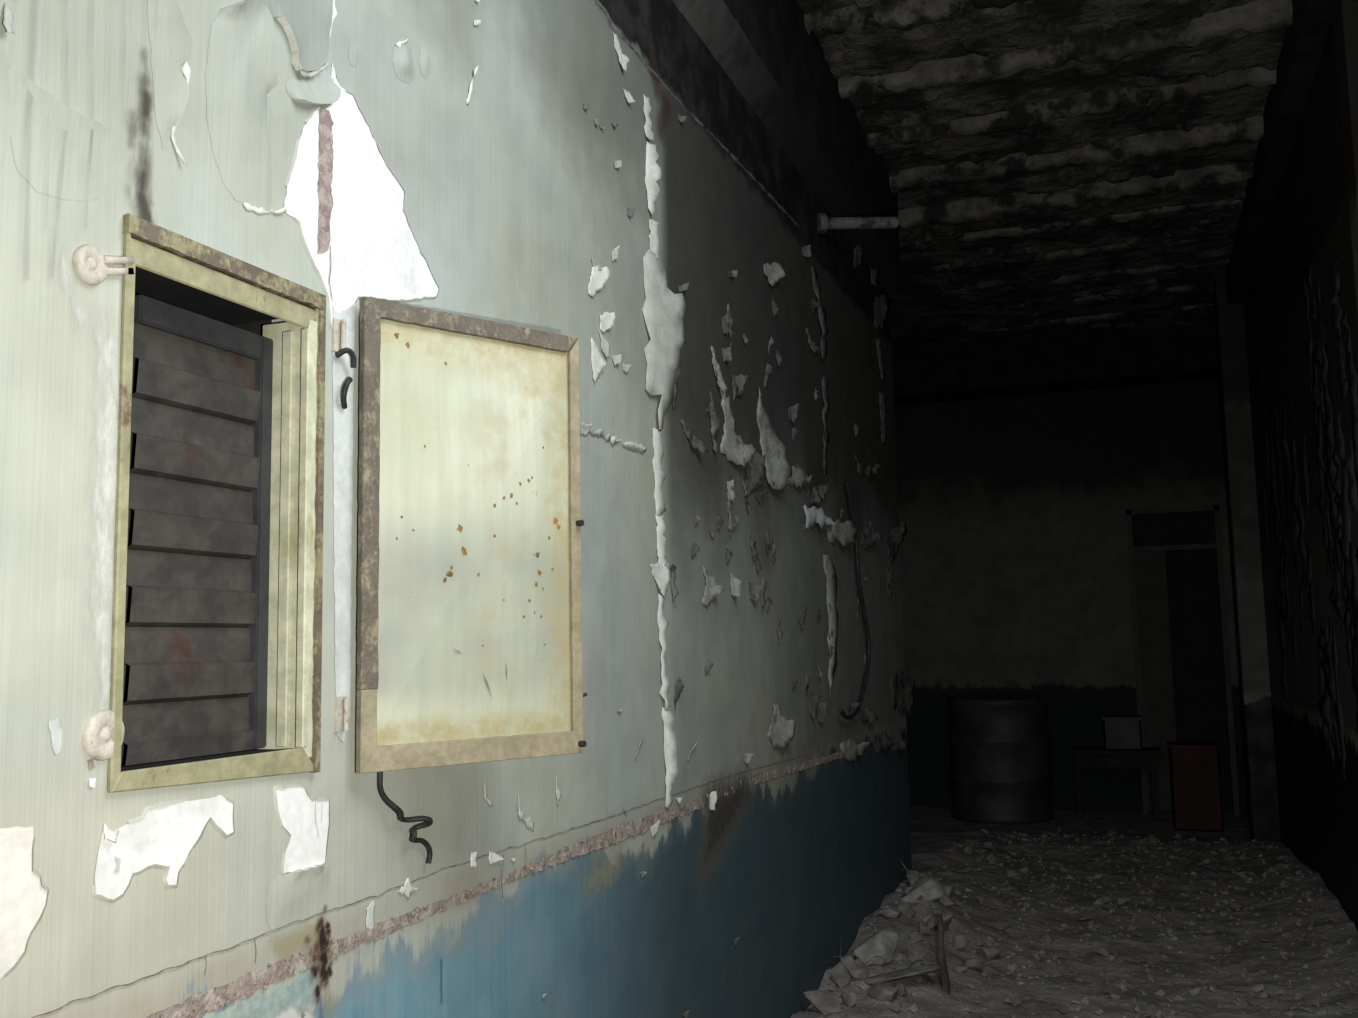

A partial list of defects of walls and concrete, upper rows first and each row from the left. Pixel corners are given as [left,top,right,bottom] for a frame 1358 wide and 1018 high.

peeling [147,61,915,1018]
peeling [48,718,62,755]
peeling [87,759,96,787]
peeling [0,826,50,979]
peeling [92,795,235,903]
rust [277,906,333,1007]
crack [32,755,805,1018]